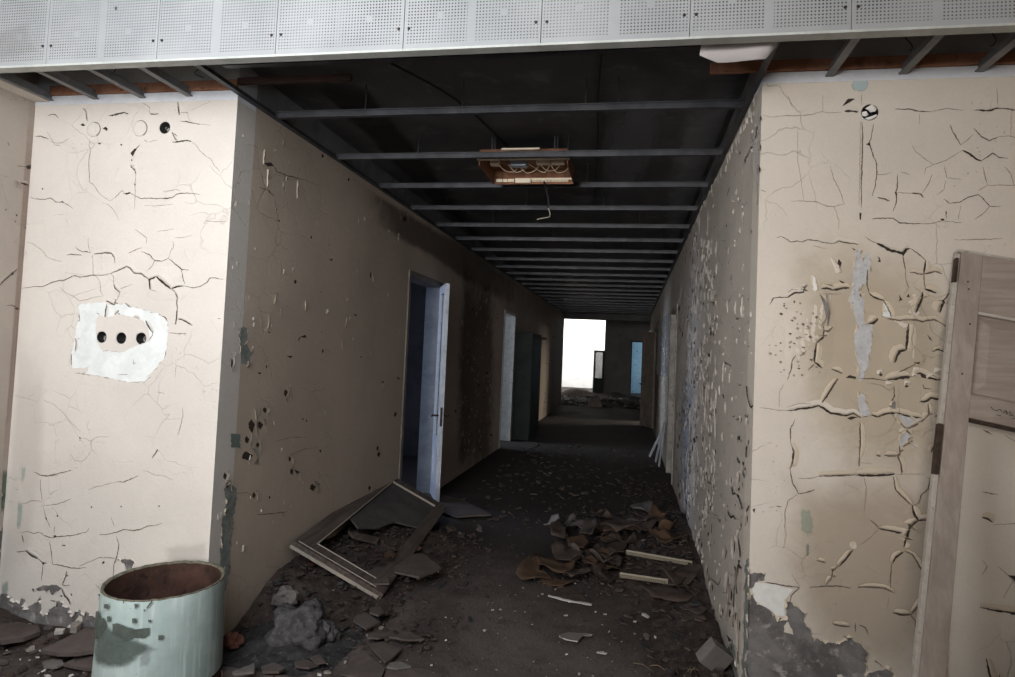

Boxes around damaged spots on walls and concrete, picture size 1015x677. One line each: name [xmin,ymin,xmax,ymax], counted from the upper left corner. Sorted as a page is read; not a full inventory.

crack [9,395,162,604]
crack [0,101,226,383]
peeling [231,316,272,370]
flaking render [657,94,898,677]
crack [693,94,1015,667]
crack [986,658,1005,677]